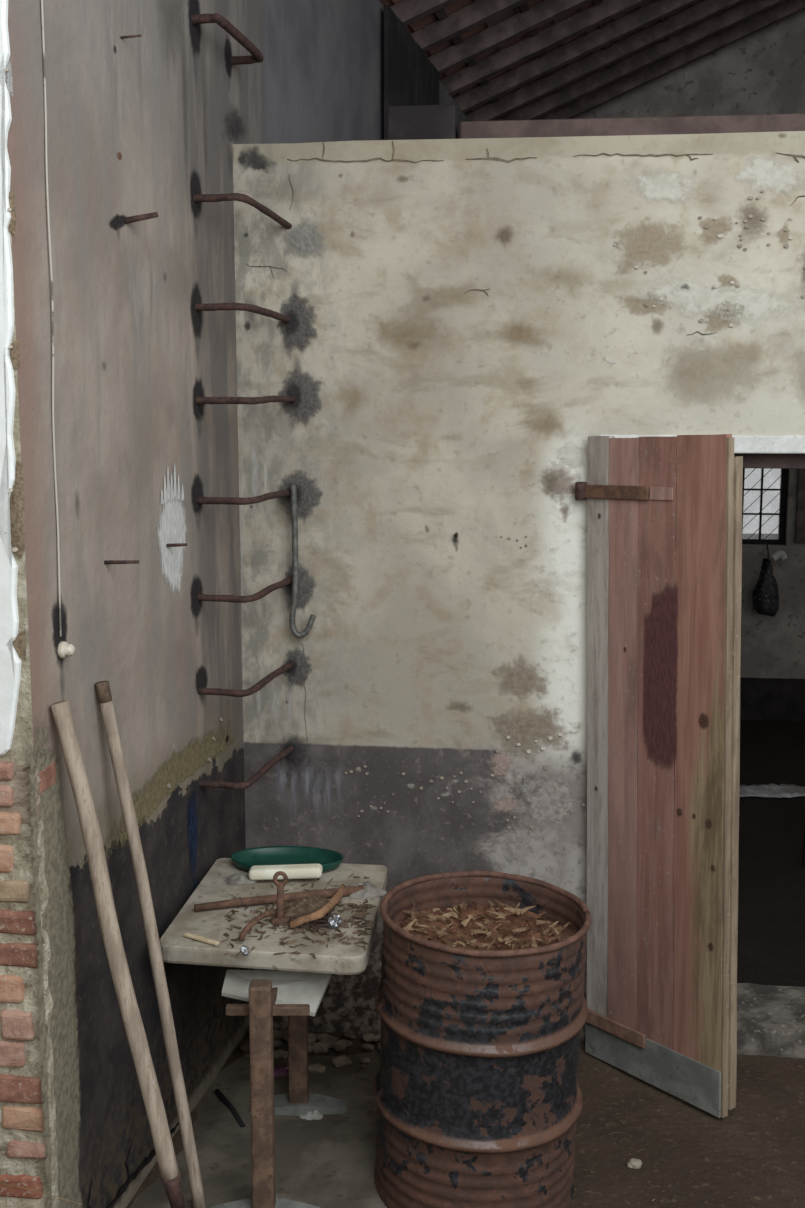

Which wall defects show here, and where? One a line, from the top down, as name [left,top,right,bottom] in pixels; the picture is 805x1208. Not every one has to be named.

crack [573,153,707,161]
damp [494,659,546,697]
damp [494,766,585,833]
flaking render [0,761,59,1208]